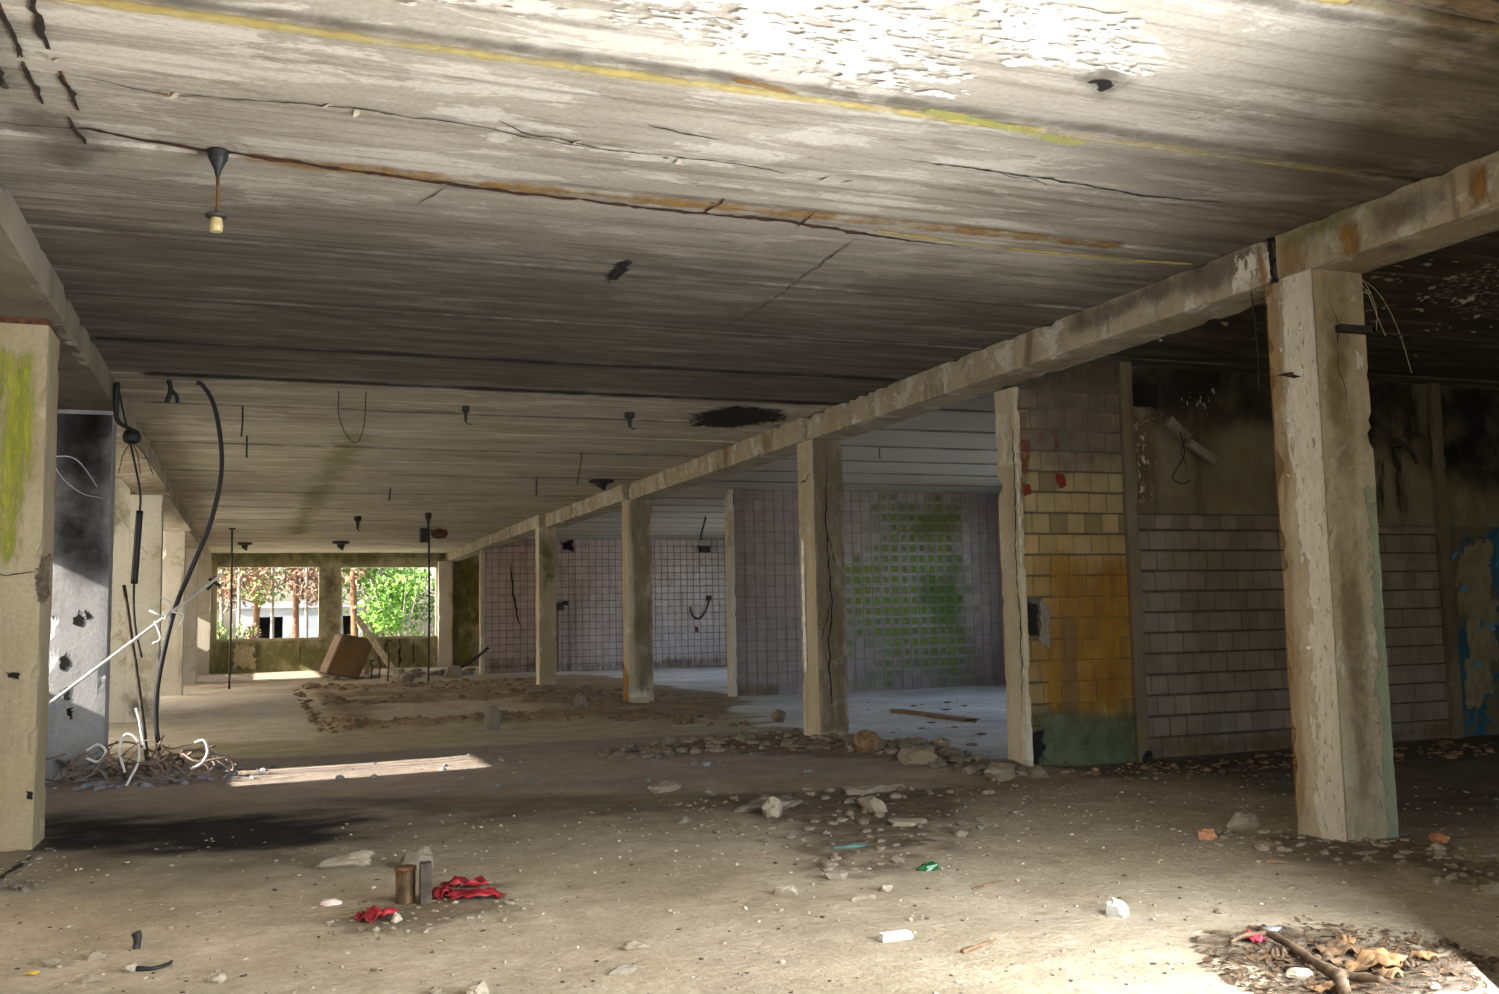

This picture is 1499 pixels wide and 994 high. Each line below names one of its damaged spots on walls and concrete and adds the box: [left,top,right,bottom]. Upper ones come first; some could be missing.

peeling [398,0,569,25]
peeling [599,0,1167,102]
spalling [1388,0,1499,24]
corrosion [1470,165,1487,206]
damp [1371,384,1416,514]
peeling [1451,537,1499,710]